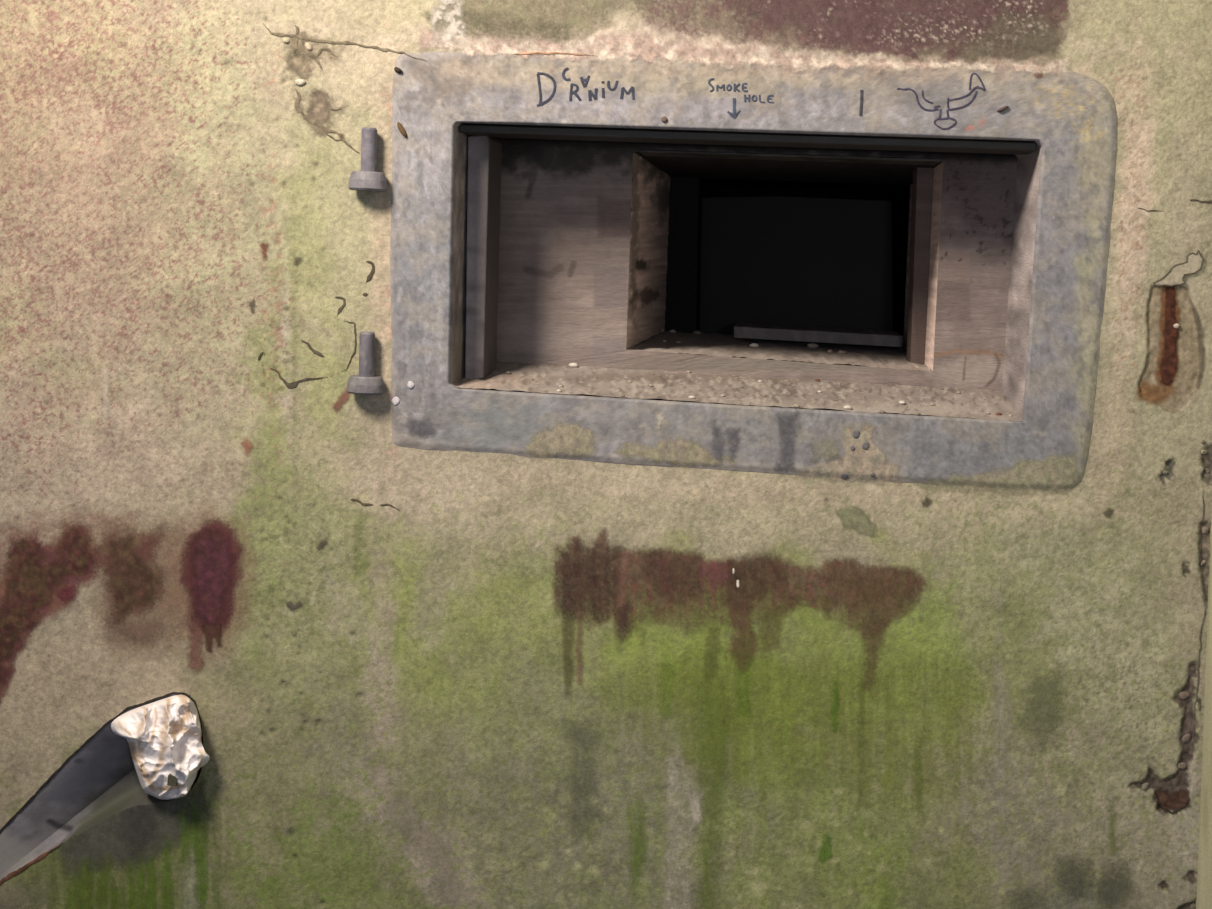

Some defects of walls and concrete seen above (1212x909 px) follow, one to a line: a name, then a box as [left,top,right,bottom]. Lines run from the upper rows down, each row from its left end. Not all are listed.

crack [264,25,424,69]
crack [294,89,359,153]
rust [1137,286,1180,402]
spalling [1160,459,1175,483]
rust [0,520,242,702]
rust [554,531,924,688]
spalling [1183,521,1211,600]
spalling [1130,664,1199,814]
leakage [61,793,205,878]
leakage [664,758,701,909]